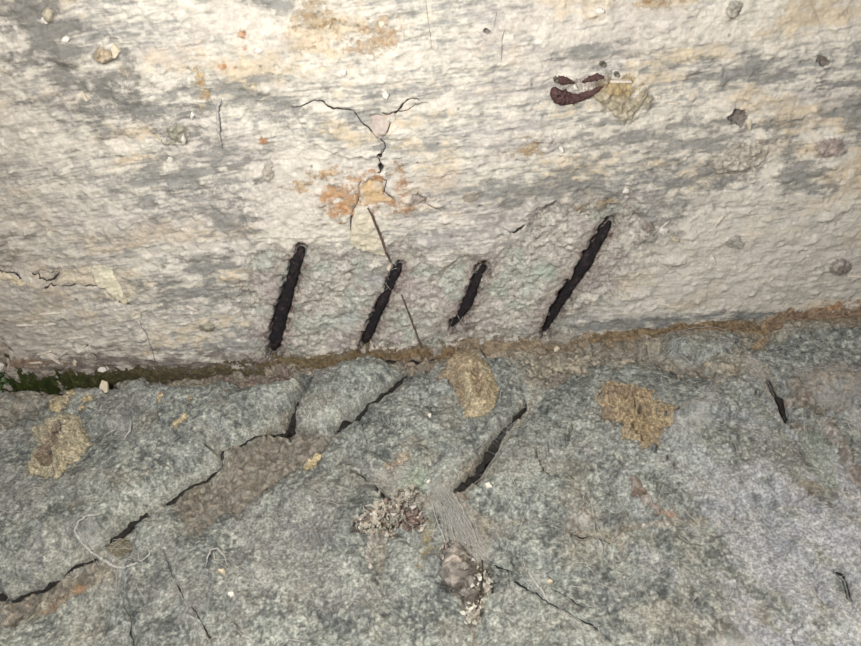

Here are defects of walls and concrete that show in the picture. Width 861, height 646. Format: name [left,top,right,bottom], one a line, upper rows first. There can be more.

crack [292,98,420,231]
spalling [236,180,668,365]
crack [166,391,307,505]
crack [337,359,437,433]
crack [453,404,526,493]
crack [0,513,147,602]